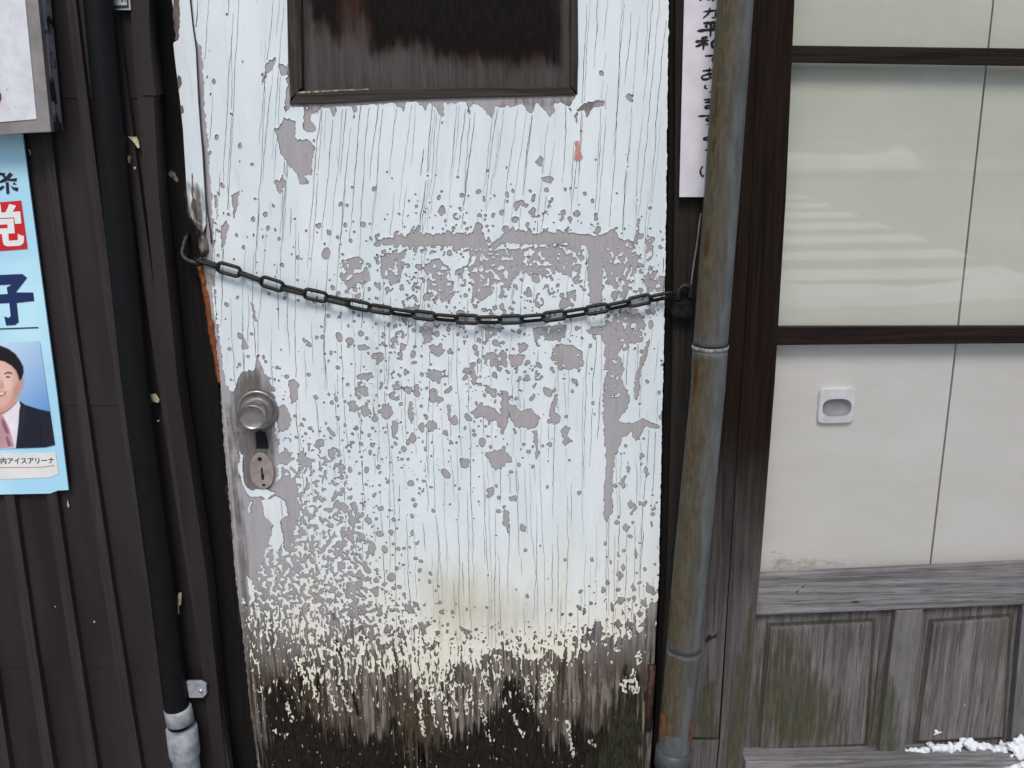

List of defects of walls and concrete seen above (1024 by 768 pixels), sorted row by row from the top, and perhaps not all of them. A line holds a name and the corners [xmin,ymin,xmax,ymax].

peeling [189,40,665,768]
leakage [256,646,655,768]